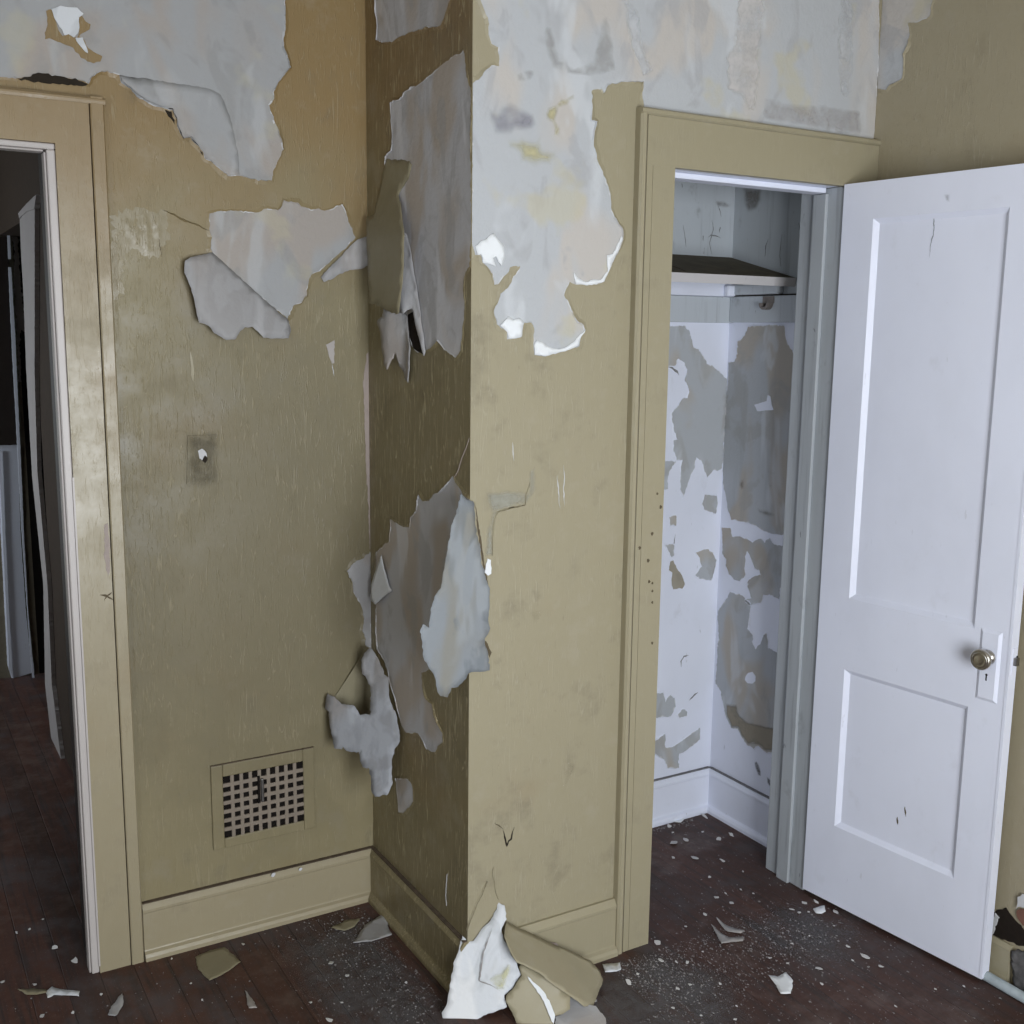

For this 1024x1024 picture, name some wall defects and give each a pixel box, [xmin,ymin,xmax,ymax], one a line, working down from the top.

peeling [0,0,292,185]
peeling [184,0,935,382]
peeling [395,775,415,816]
peeling [345,474,470,754]
peeling [656,691,688,719]
peeling [655,727,701,769]
peeling [664,323,793,754]
spalling [992,894,1024,946]